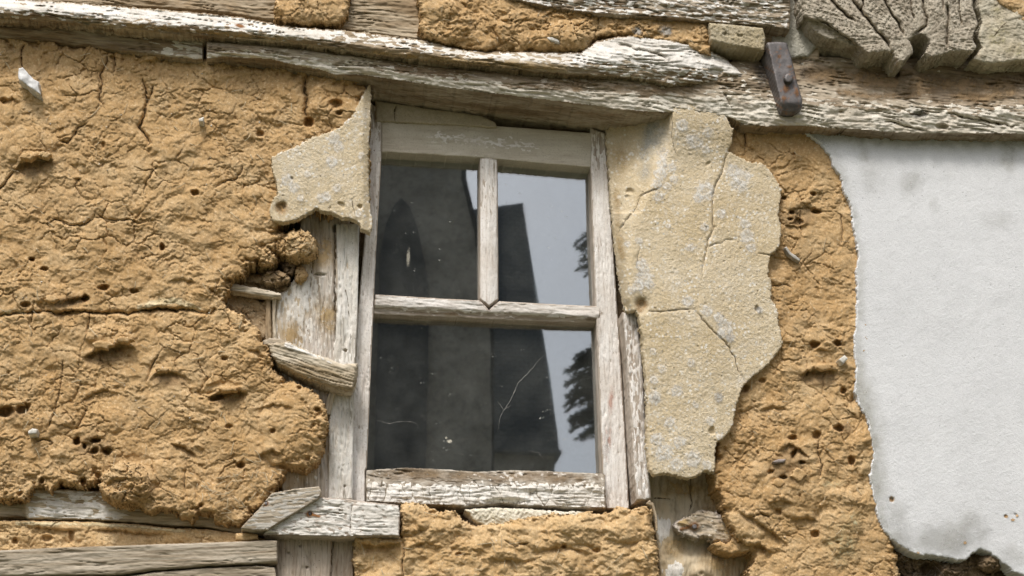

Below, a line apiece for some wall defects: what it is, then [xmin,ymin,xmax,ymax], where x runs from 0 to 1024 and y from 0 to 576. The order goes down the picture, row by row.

crack [827,0,948,50]
peeling [0,0,1024,134]
crack [301,75,309,120]
crack [138,83,156,193]
crack [51,179,149,226]
spalling [44,295,81,307]
crack [0,300,222,340]
spalling [89,336,135,362]
crack [651,309,740,373]
spalling [805,355,848,385]
spalling [772,453,807,488]
peeling [28,491,126,520]